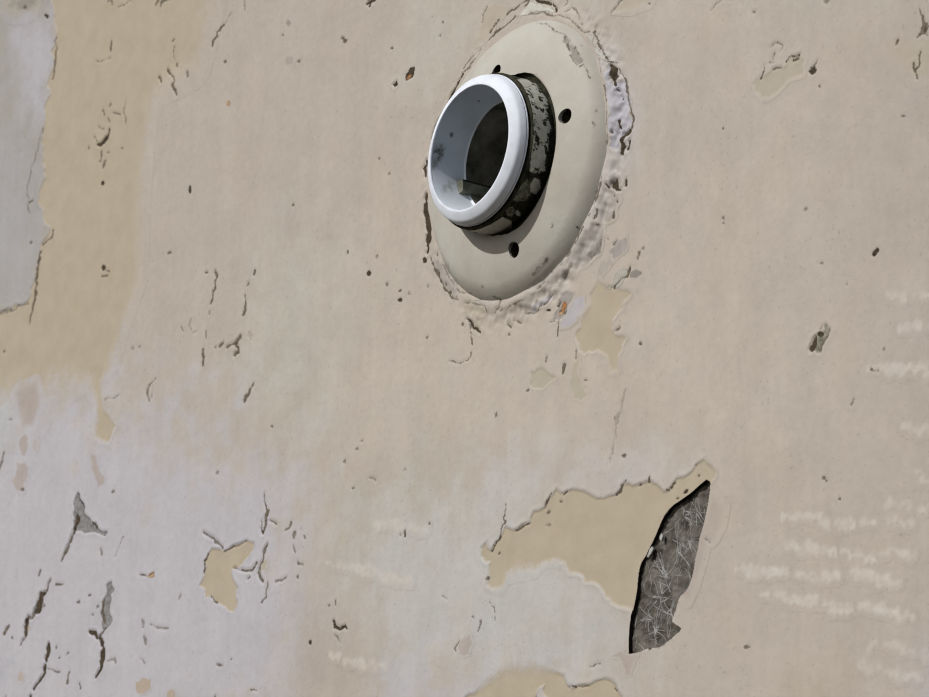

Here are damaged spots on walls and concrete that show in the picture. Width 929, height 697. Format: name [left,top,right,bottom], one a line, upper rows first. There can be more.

peeling [468,78,551,236]
spalling [810,329,830,352]
leakage [11,374,45,495]
crack [3,531,74,646]
spalling [73,493,107,536]
peeling [198,539,269,614]
crack [235,494,306,603]
peeling [478,455,718,654]
leakage [730,463,929,689]
crack [29,642,81,697]
peeling [463,650,624,697]